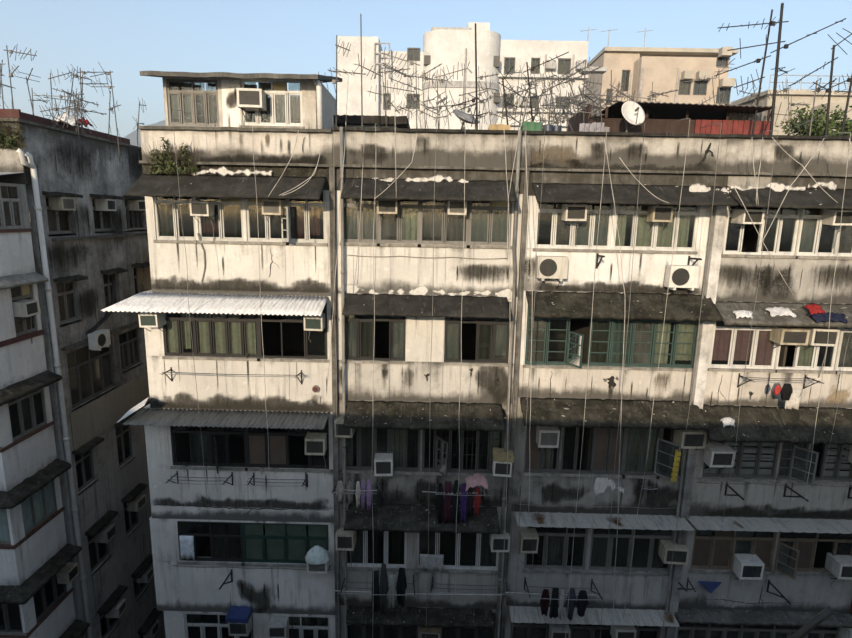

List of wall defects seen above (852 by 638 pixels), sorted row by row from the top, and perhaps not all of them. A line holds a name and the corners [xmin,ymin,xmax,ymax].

water stain [226,91,237,136]
water stain [53,145,143,185]
water stain [201,132,325,168]
water stain [524,140,710,171]
water stain [776,145,802,169]
water stain [150,277,328,292]
water stain [719,265,802,297]
water stain [819,266,852,287]
water stain [542,484,584,503]
peeling [594,477,624,495]
water stain [634,483,682,508]
water stain [238,581,279,638]